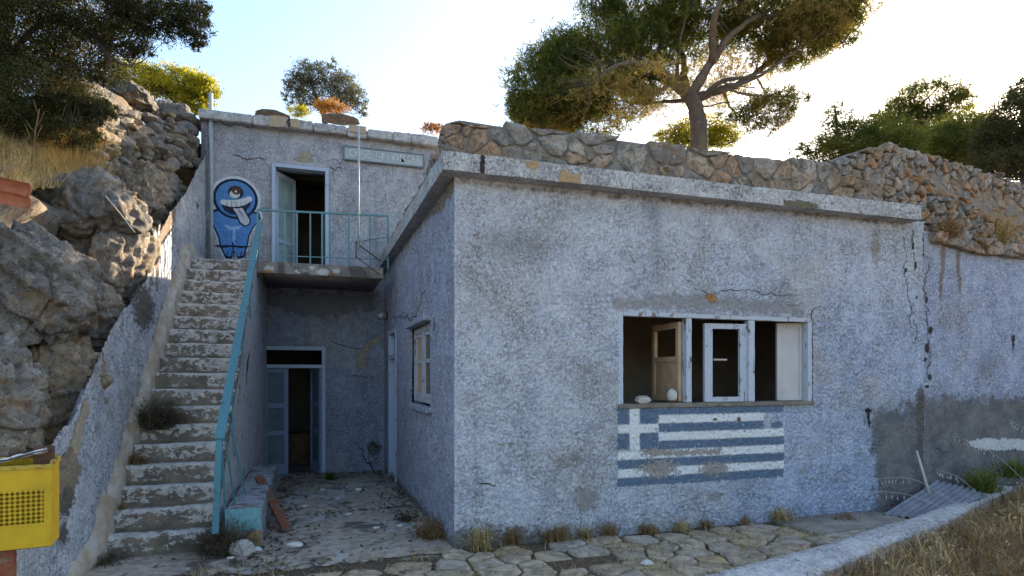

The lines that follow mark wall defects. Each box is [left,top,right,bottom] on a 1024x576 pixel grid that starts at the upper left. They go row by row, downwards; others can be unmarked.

crack [701,289,818,320]
crack [902,229,932,389]
leakage [939,245,962,311]
peeling [107,258,262,552]
peeling [633,447,731,481]
leakage [915,386,924,490]